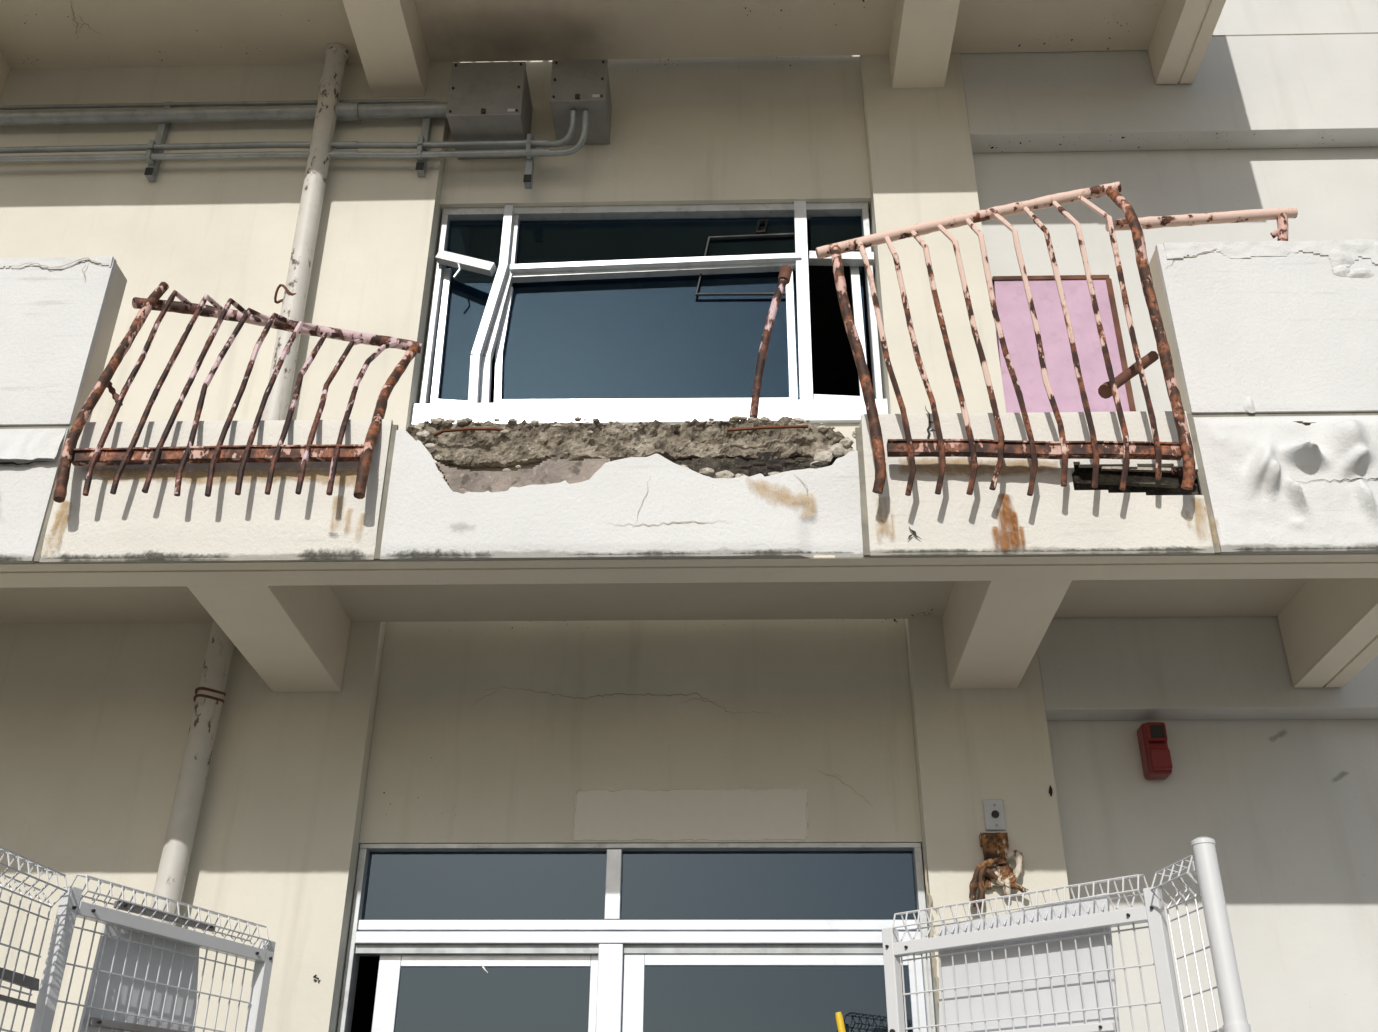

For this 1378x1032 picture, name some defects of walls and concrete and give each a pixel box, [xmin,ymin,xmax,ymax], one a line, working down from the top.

peeling [0,256,114,270]
peeling [0,428,67,465]
spalling [406,416,856,494]
corrosion [902,459,1055,474]
crack [1296,476,1378,484]
corrosion [93,469,364,530]
corrosion [993,494,1025,550]